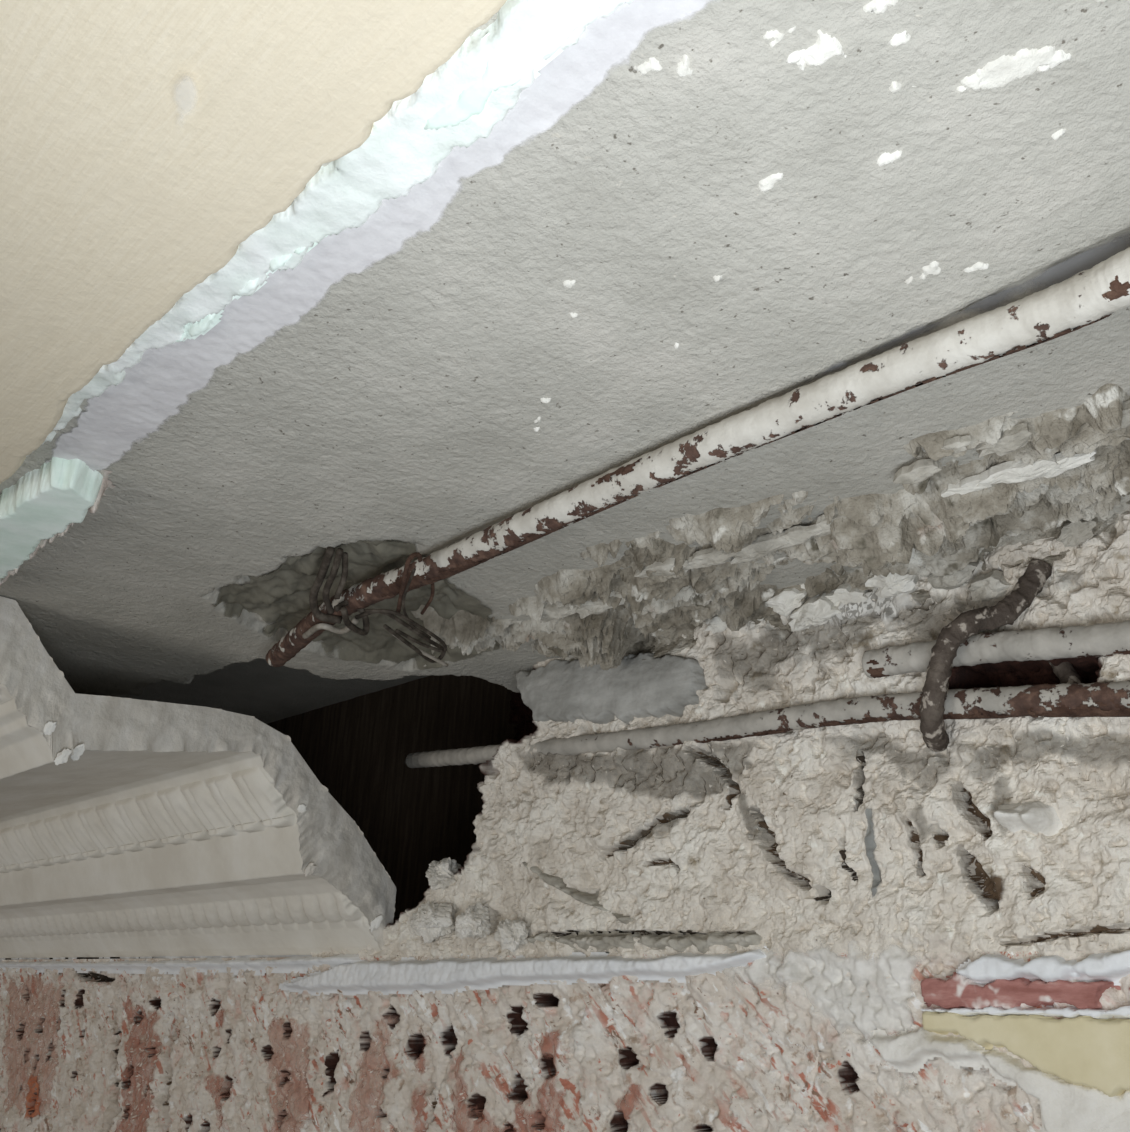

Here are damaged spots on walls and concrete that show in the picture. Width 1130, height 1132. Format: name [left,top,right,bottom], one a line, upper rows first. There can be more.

peeling [786,30,847,71]
peeling [957,46,1071,92]
peeling [877,150,902,167]
peeling [758,173,784,192]
peeling [42,0,711,513]
rust [654,275,1130,488]
rust [591,458,642,487]
rust [380,495,638,597]
spalling [411,383,1130,670]
rust [866,660,887,678]
rust [943,699,1130,720]
peeling [920,950,1130,1097]